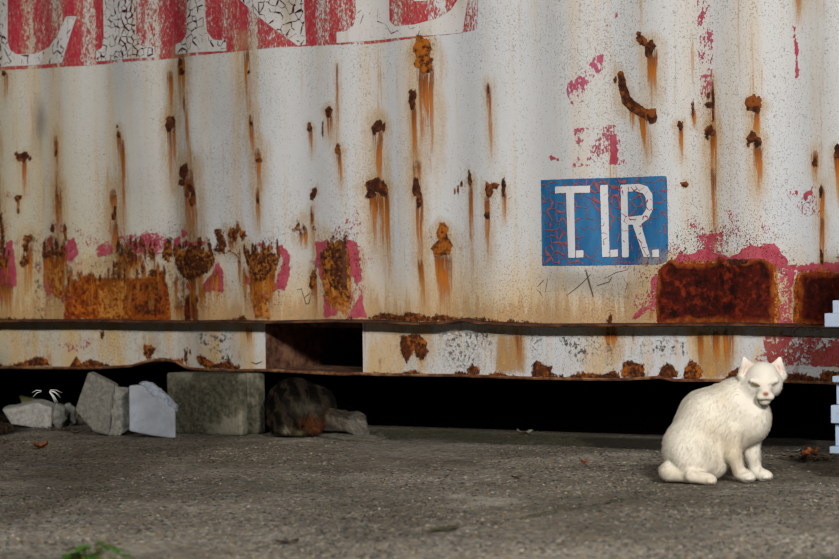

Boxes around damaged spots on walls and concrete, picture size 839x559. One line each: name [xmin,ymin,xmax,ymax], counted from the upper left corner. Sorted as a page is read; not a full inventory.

crack [96,0,154,60]
crack [176,0,226,54]
crack [243,0,304,45]
rust [408,34,437,151]
peeling [566,54,604,104]
rust [64,56,298,321]
rust [412,164,456,300]
peeling [573,125,625,168]
crack [542,177,667,265]
rust [744,94,762,181]
peeling [613,210,839,371]
rust [443,312,645,378]